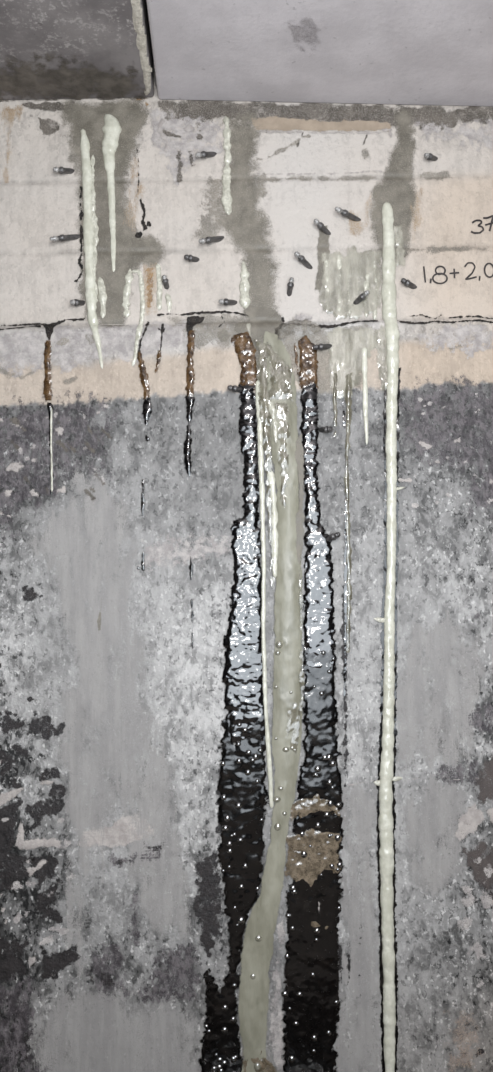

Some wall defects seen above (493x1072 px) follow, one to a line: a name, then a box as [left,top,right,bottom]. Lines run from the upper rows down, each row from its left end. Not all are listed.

crack [0,318,85,340]
rust [43,339,52,401]
rust [185,330,196,397]
crack [138,310,248,352]
rust [230,332,258,391]
water stain [0,53,493,587]
rust [294,335,319,389]
crack [275,314,493,335]
peeling [398,374,493,519]
water stain [285,579,305,754]